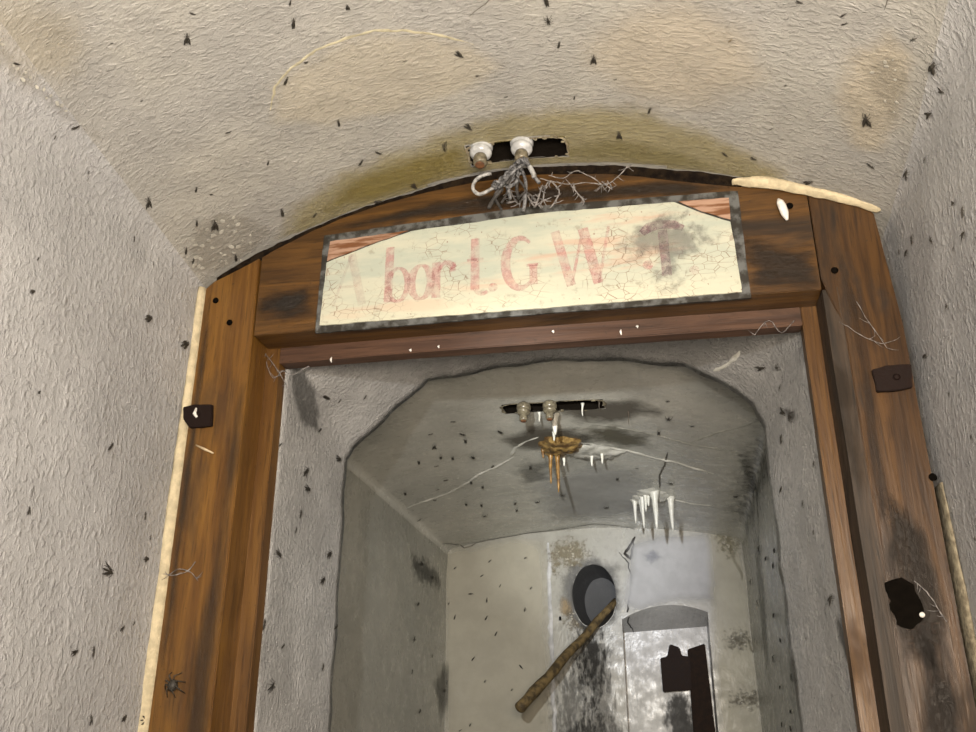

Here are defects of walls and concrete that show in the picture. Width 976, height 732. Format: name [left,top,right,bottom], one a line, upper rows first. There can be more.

leakage [270,29,473,110]
leakage [352,183,703,226]
leakage [406,402,759,531]
crack [659,452,668,488]